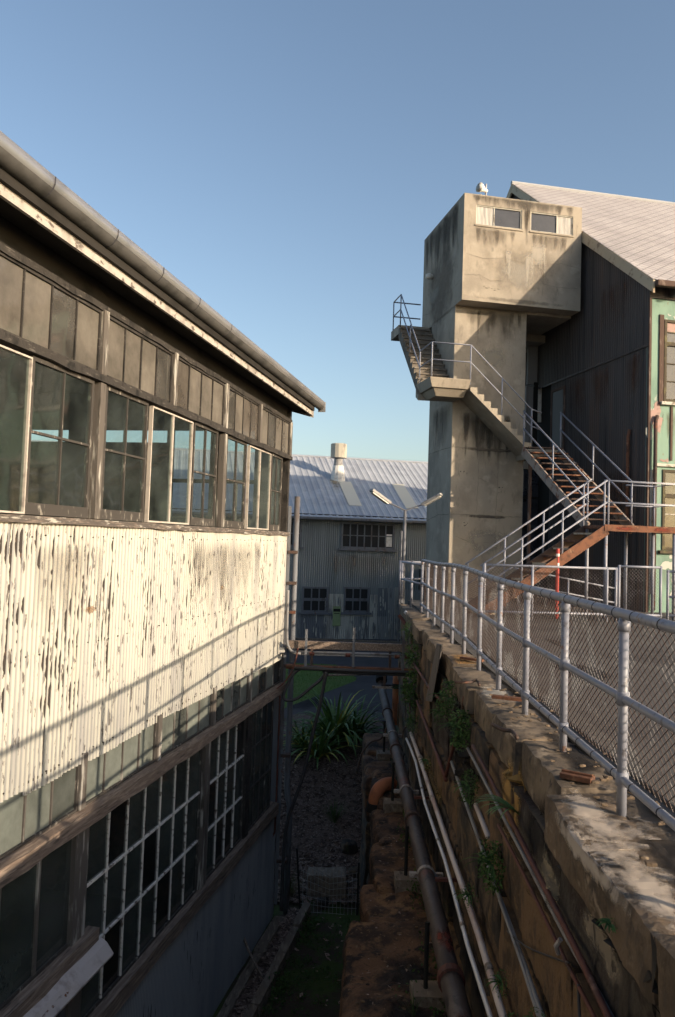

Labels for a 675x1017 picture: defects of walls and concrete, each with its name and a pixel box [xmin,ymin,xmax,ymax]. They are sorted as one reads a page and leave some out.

leakage [426,208,458,319]
leakage [477,196,572,229]
peeling [0,523,55,675]
peeling [40,527,118,766]
peeling [141,538,161,658]
peeling [168,535,211,664]